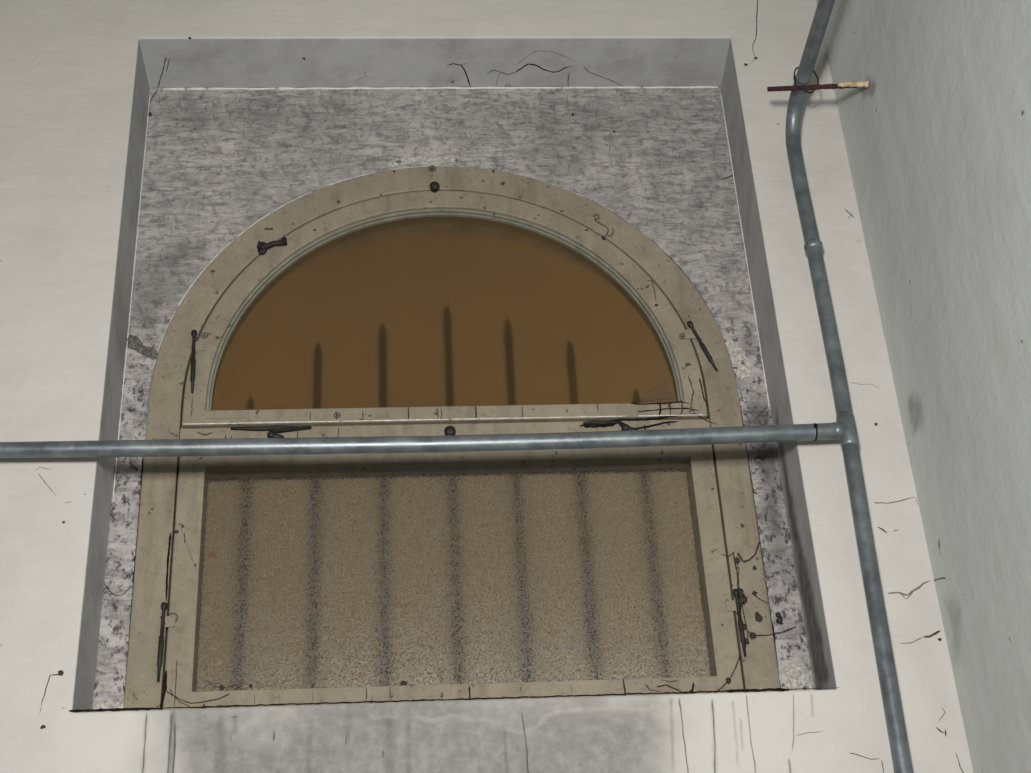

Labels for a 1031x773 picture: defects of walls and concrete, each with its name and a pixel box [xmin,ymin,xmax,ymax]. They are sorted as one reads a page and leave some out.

crack [744,0,758,66]
crack [447,50,622,121]
crack [888,577,946,599]
crack [900,630,942,644]
damp [193,702,631,773]